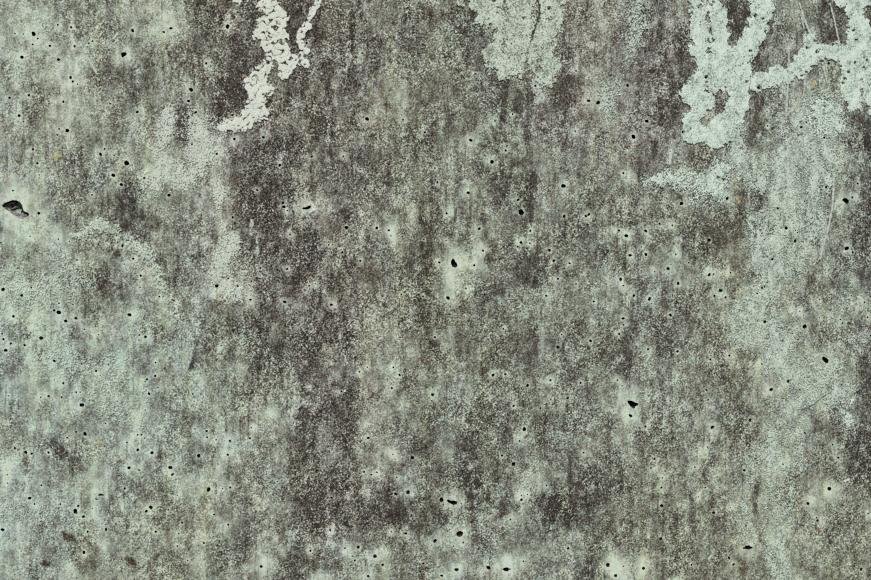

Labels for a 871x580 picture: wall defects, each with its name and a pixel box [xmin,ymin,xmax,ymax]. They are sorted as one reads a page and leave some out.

water stain [33,341,159,431]
water stain [0,0,366,376]
water stain [480,218,544,297]
water stain [456,0,569,222]
water stain [589,0,871,580]
water stain [0,495,58,531]